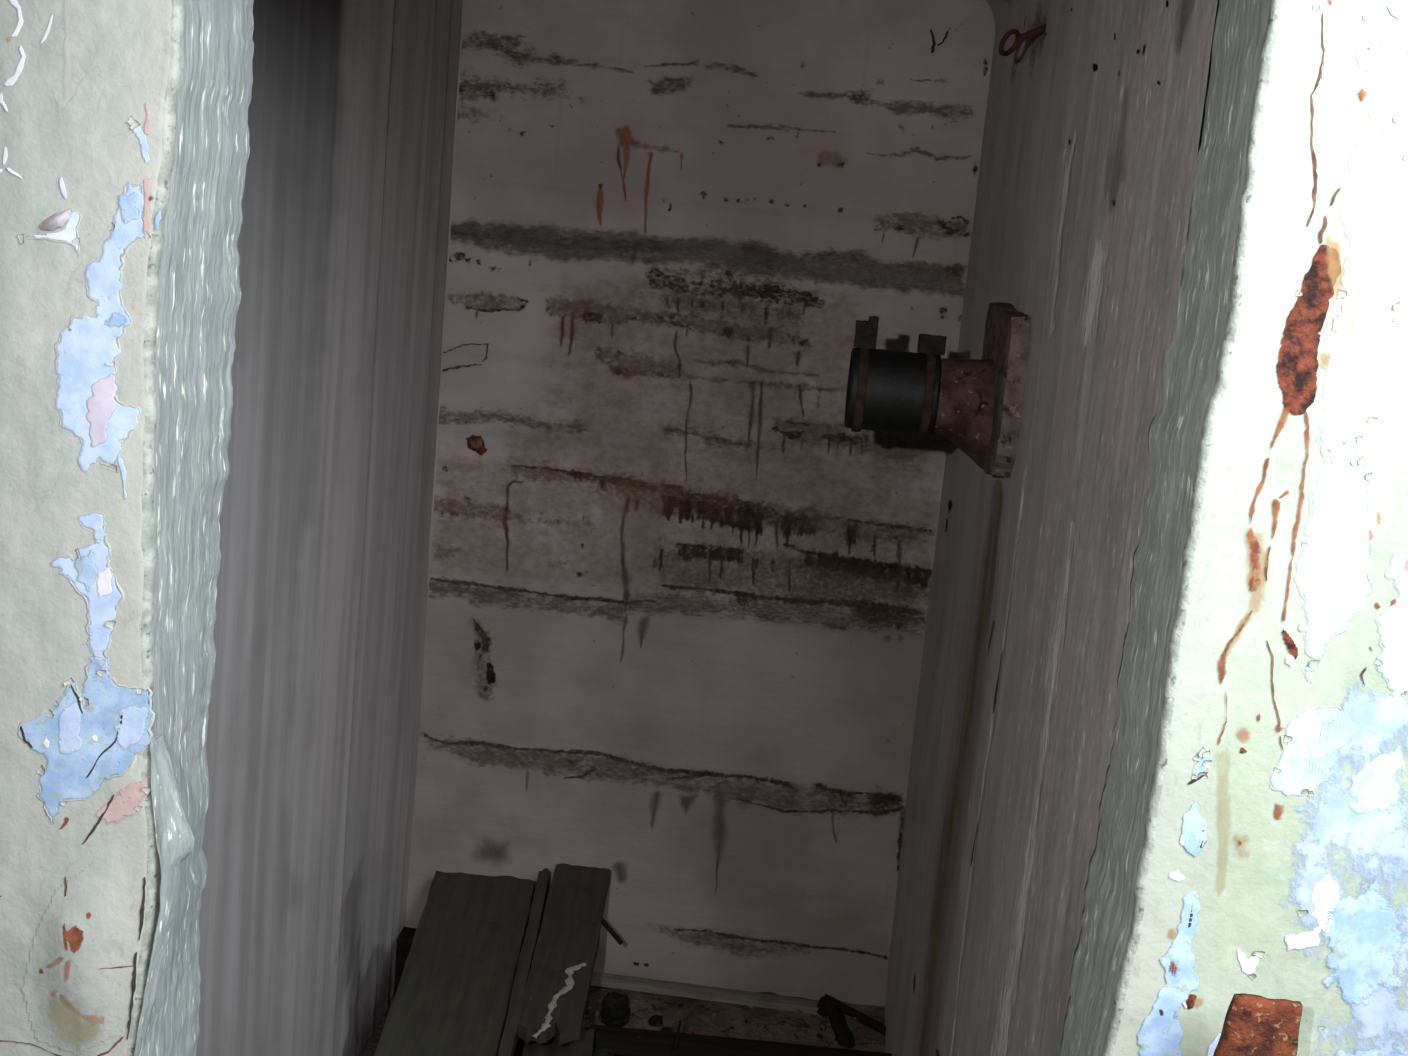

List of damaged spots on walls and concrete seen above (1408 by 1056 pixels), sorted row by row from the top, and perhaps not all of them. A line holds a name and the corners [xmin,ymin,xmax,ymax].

leakage [462,31,597,65]
leakage [650,61,756,93]
leakage [887,102,972,117]
corrosion [617,127,682,232]
peeling [16,102,162,499]
leakage [451,221,964,294]
leakage [439,407,586,433]
corrosion [1218,187,1341,753]
peeling [1268,6,1408,1056]
peeling [17,512,195,1056]
peeling [1137,871,1201,1056]
peeling [1207,1033,1221,1056]